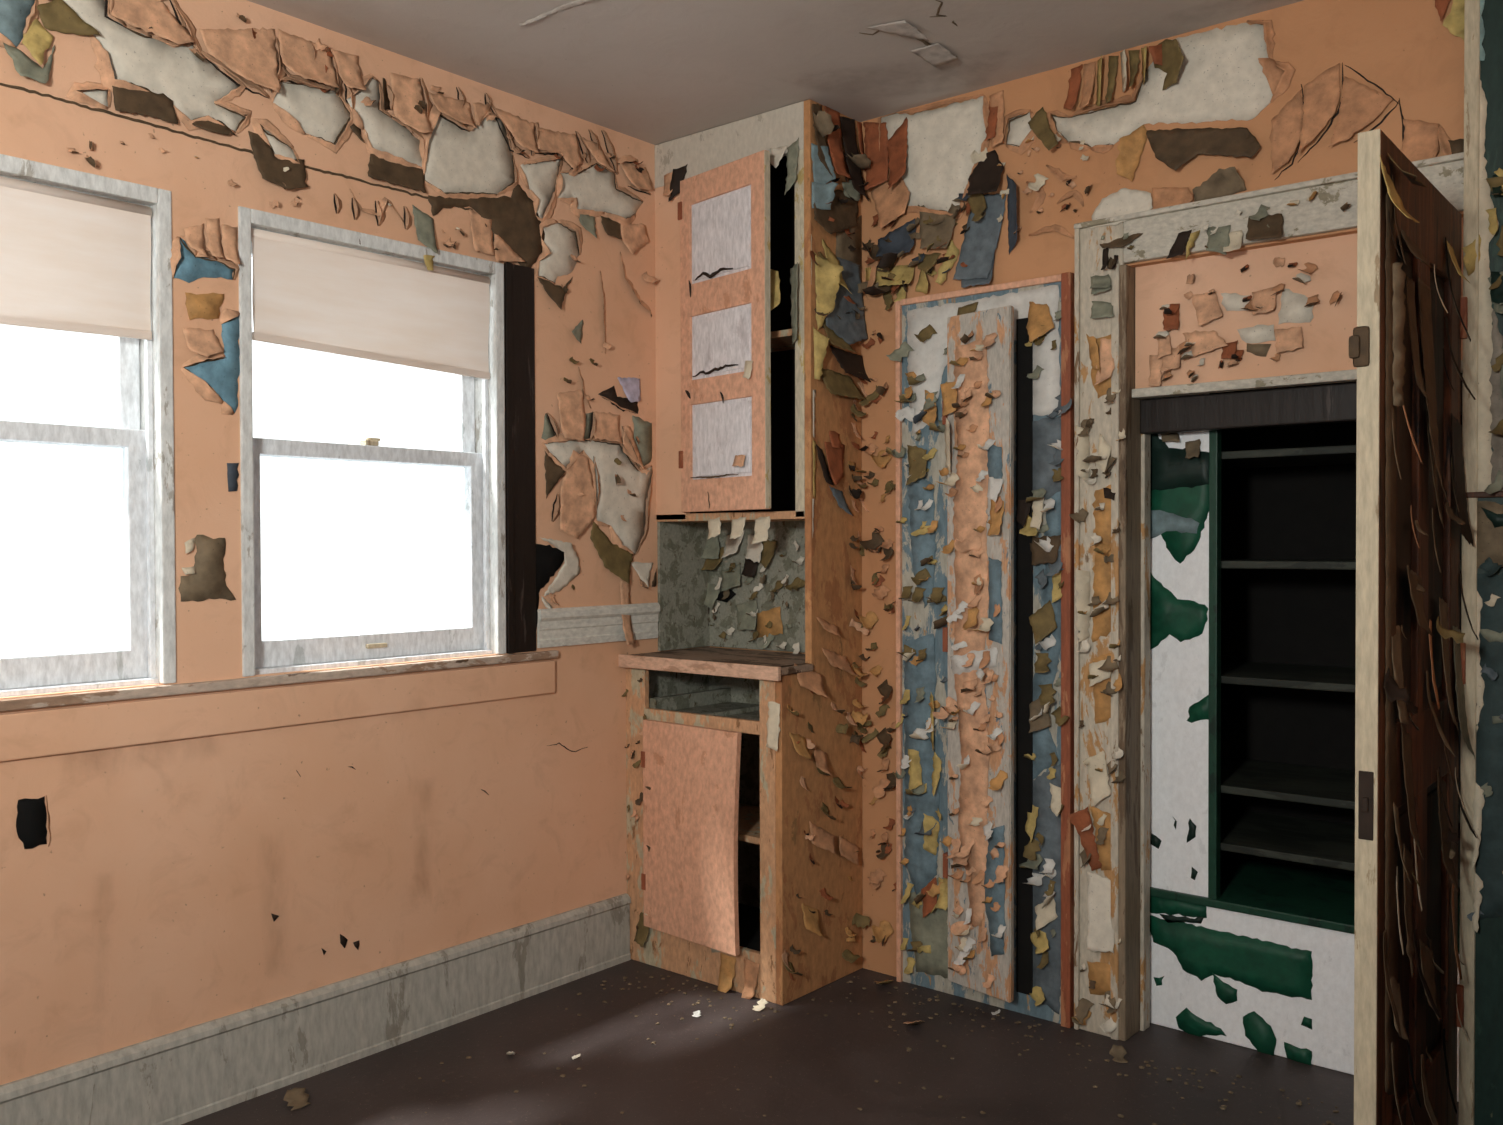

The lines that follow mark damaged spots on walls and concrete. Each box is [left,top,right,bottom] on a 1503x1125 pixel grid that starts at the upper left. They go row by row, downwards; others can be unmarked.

peeling [1435,0,1485,61]
peeling [0,0,658,317]
peeling [170,218,240,415]
peeling [178,535,236,602]
peeling [227,463,239,492]
peeling [540,271,657,645]
peeling [787,20,1342,891]
peeling [1380,80,1503,1125]
peeling [1150,896,1313,1065]